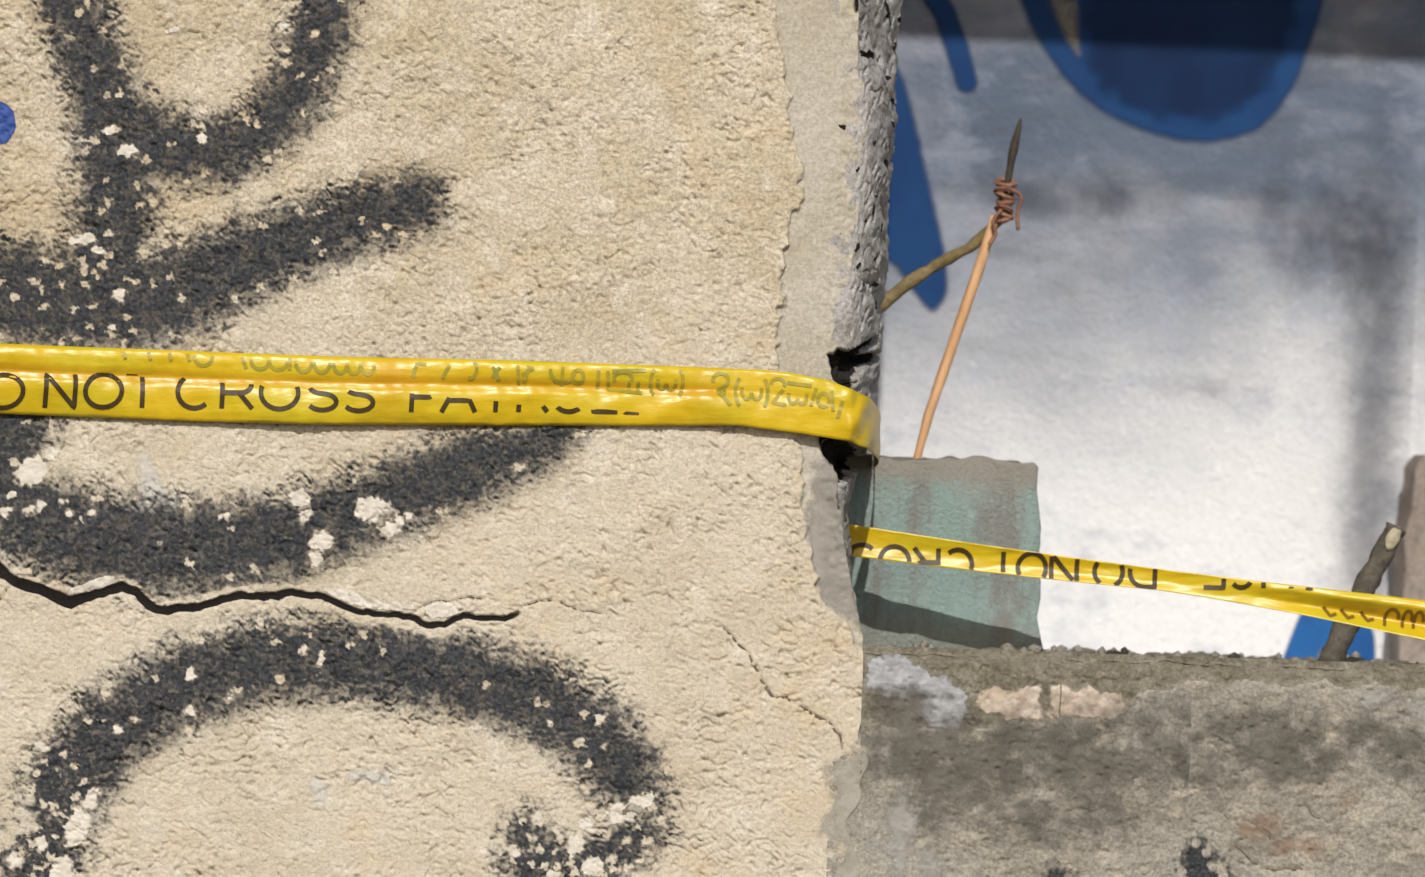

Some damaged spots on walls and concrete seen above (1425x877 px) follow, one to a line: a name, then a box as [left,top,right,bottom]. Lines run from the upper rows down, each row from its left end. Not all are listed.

crack [855,0,891,26]
crack [0,563,603,628]